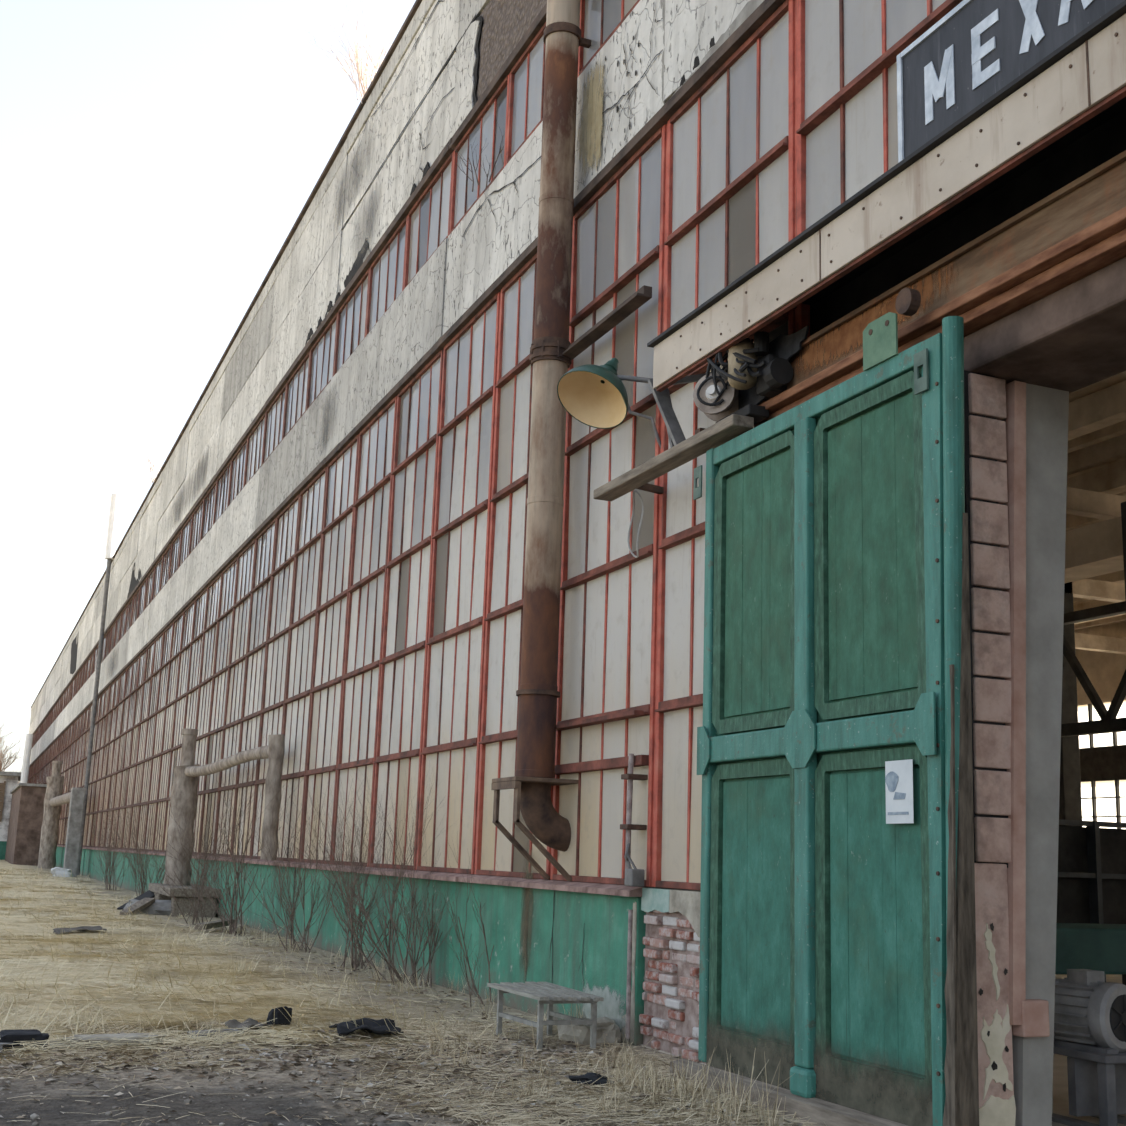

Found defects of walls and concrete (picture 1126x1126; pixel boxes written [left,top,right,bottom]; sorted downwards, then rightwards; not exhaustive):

crack [308,0,476,282]
crack [462,156,541,237]
crack [601,0,665,162]
spalling [620,888,701,1062]
peeling [979,923,1016,1126]